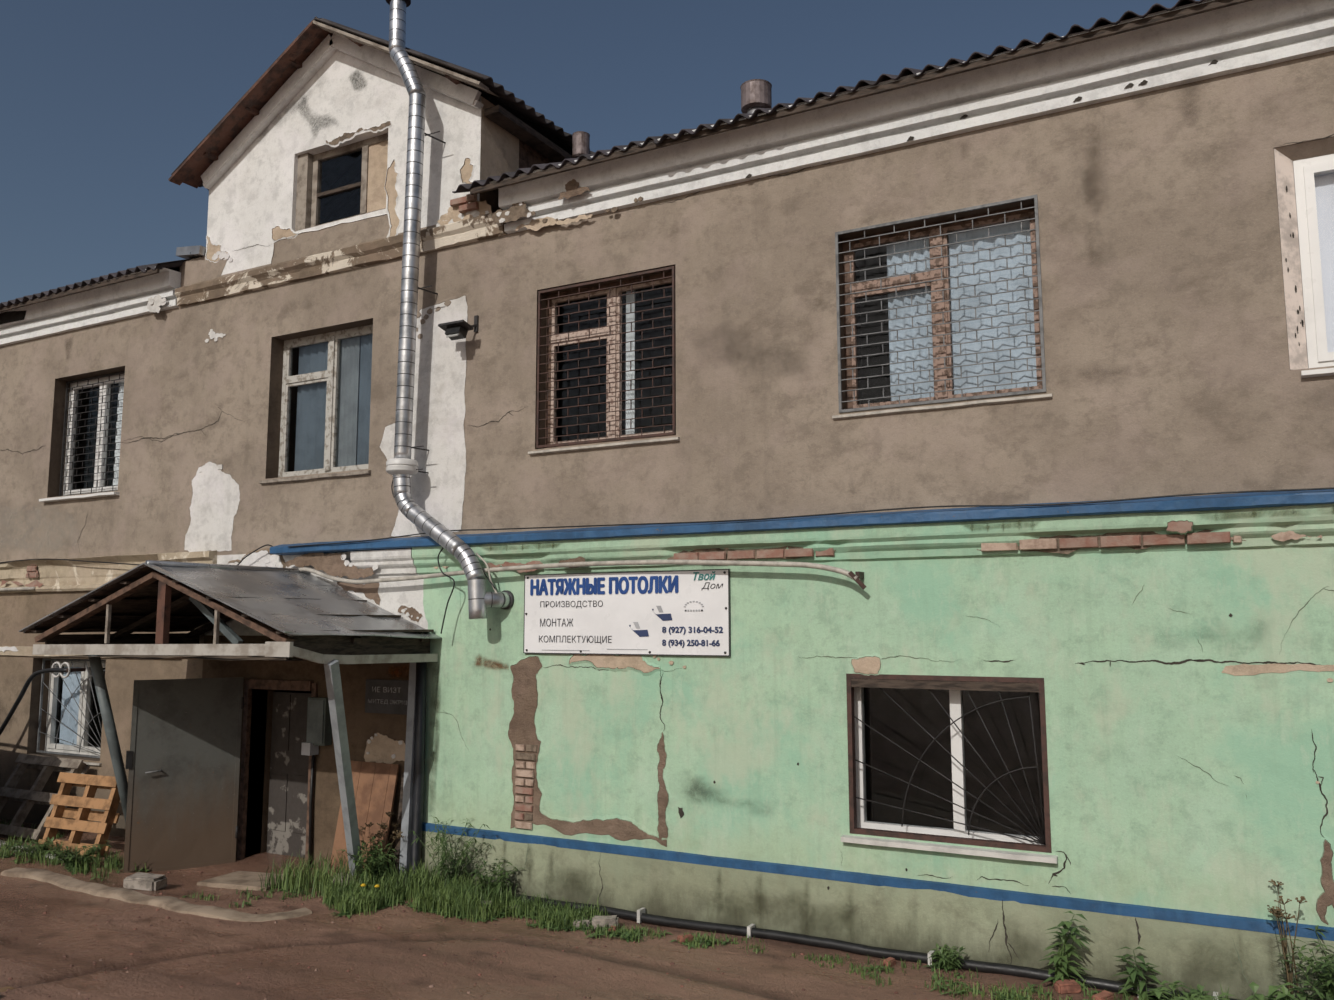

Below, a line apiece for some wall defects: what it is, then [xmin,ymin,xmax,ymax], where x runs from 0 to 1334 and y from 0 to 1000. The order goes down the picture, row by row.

flaking render [271,158,401,265]
crack [122,407,243,443]
flaking render [183,459,383,607]
spalling [667,546,836,561]
spalling [977,520,1246,554]
peeling [397,604,425,624]
spalling [849,653,883,676]
crack [1075,586,1334,666]
spalling [363,731,406,764]
spalling [504,653,686,850]
crack [1312,733,1328,838]
spalling [1311,835,1334,927]